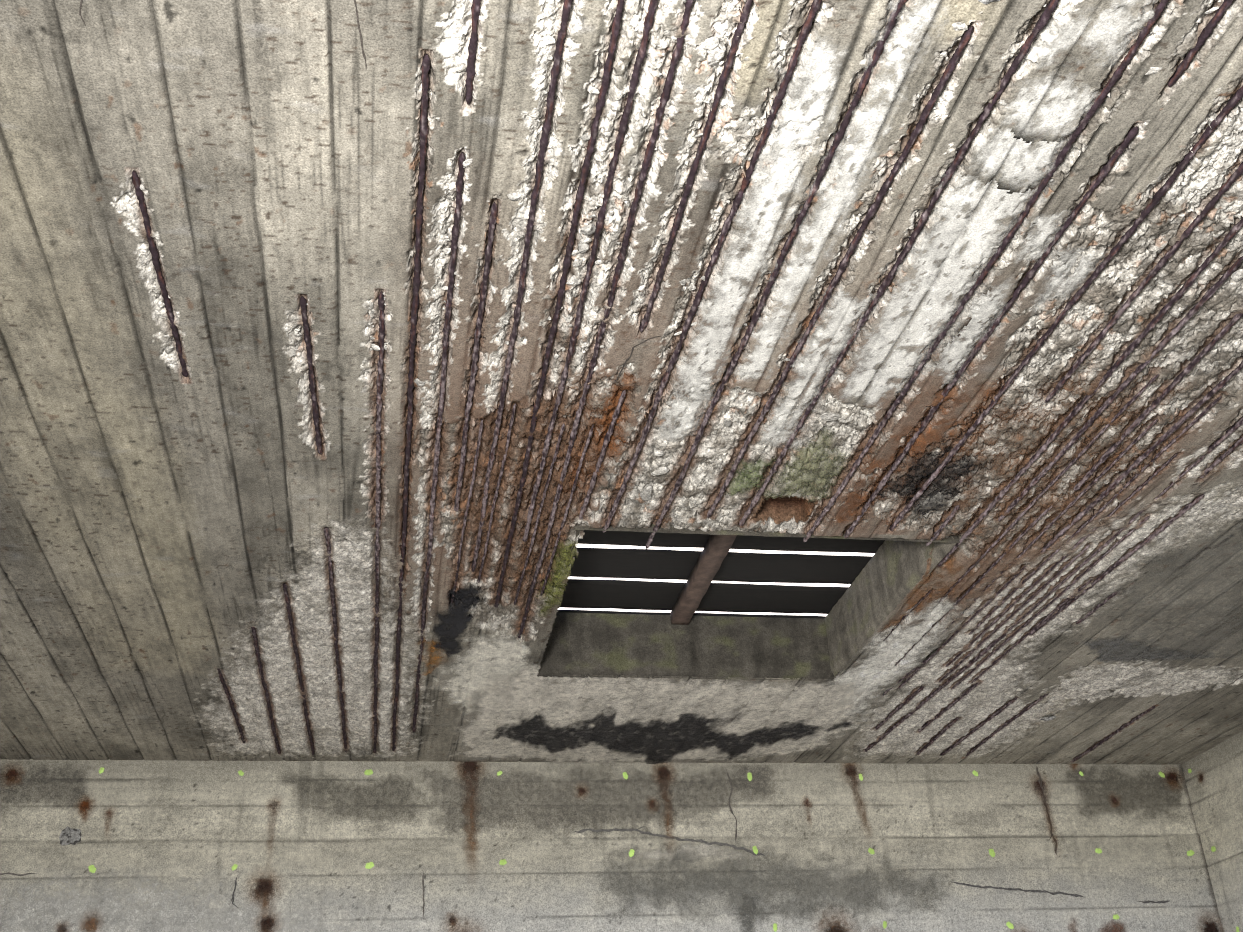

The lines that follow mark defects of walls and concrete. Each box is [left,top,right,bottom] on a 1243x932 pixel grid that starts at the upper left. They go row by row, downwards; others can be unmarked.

spalling [112,167,195,387]
corrosion [470,373,634,595]
leakage [879,447,981,515]
leakage [284,586,953,834]
corrosion [457,761,479,858]
corrosion [1034,779,1055,832]
crack [1033,766,1057,855]
corrosion [252,877,275,932]
crack [953,882,1083,897]
corrosion [1103,921,1125,932]